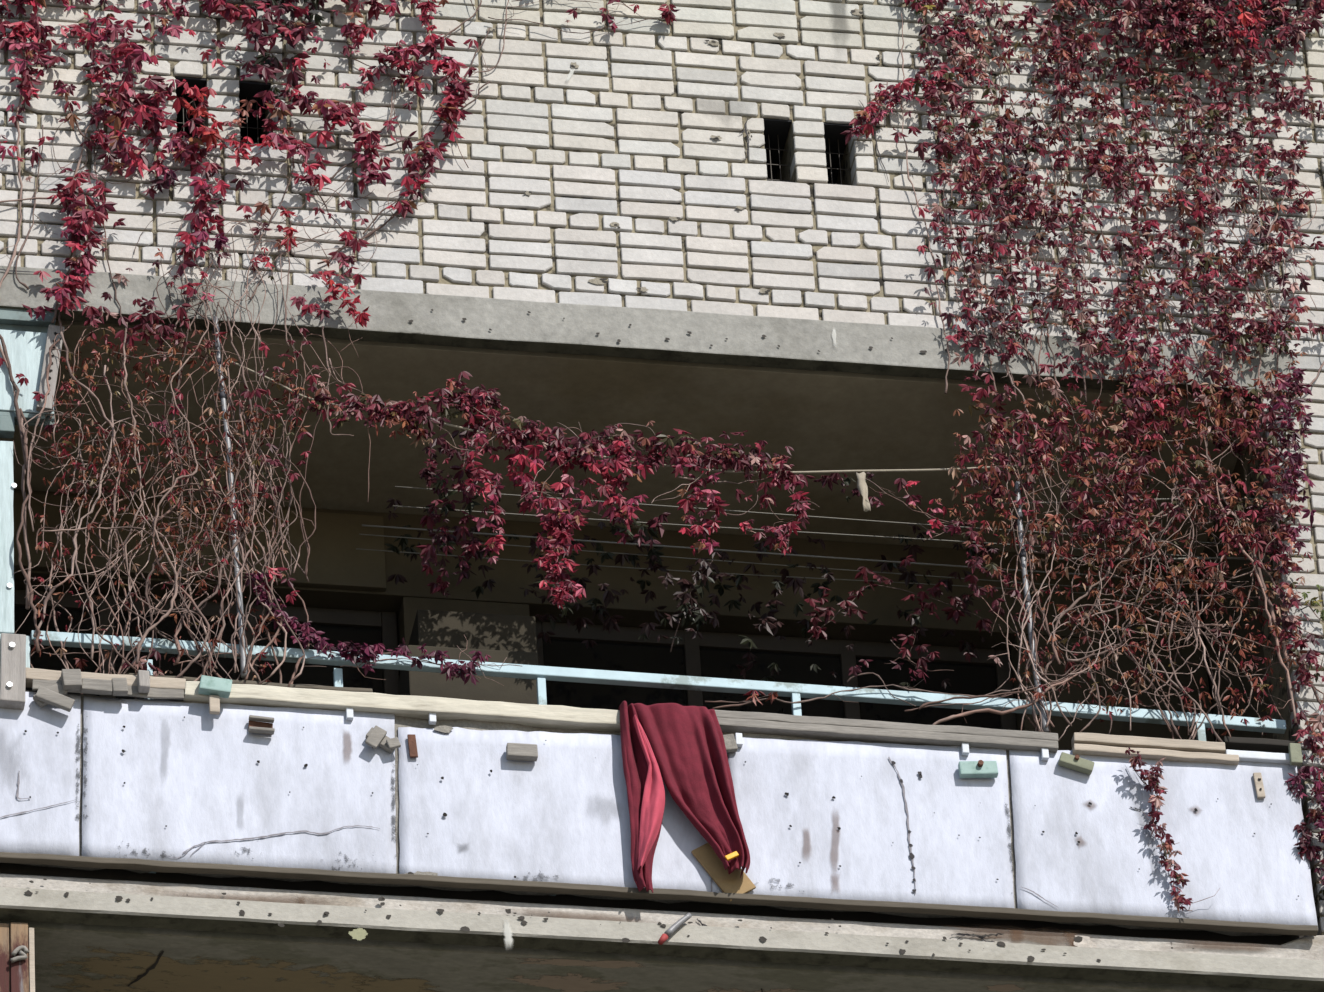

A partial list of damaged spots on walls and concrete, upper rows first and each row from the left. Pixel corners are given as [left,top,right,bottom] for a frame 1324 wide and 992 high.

crack [0,800,74,818]
crack [165,825,380,858]
crack [888,757,922,894]
crack [128,951,164,987]